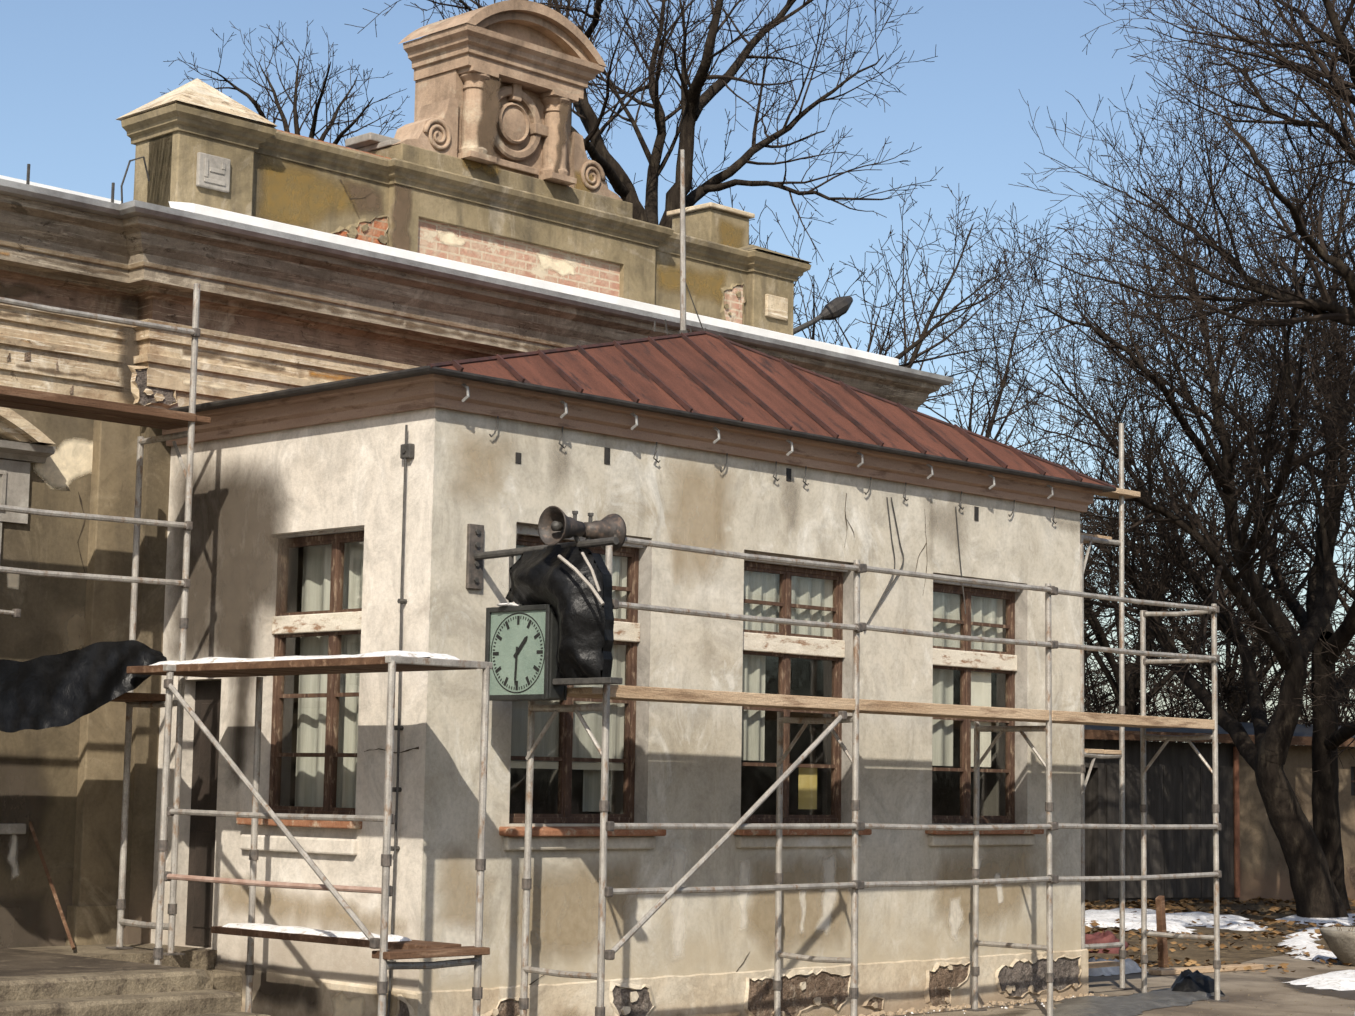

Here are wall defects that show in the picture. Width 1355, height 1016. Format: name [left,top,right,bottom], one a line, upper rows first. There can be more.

flaking render [330,214,389,246]
peeling [439,232,465,245]
peeling [537,254,575,276]
flaking render [720,282,747,325]
flaking render [480,997,528,1016]
flaking render [609,981,657,1016]
flaking render [744,968,884,1016]
flaking render [923,960,972,1007]
flaking render [995,954,1082,999]